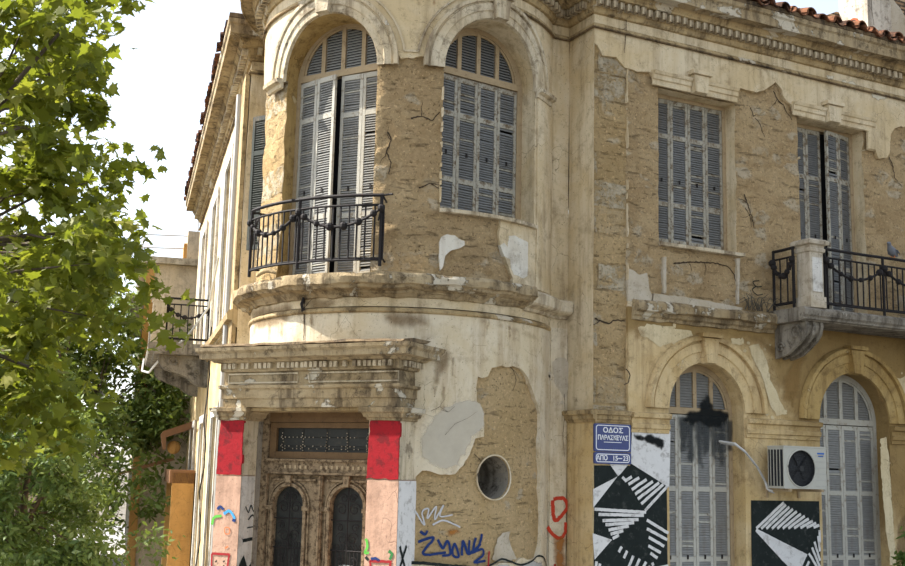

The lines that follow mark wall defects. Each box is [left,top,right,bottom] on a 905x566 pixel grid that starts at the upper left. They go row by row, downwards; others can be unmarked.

flaking render [256,81,289,282]
crack [379,127,392,175]
flaking render [370,57,511,282]
crack [590,318,625,326]
flaking render [591,44,801,419]
crack [750,91,792,137]
flaking render [862,127,905,318]
flaking render [414,366,538,566]